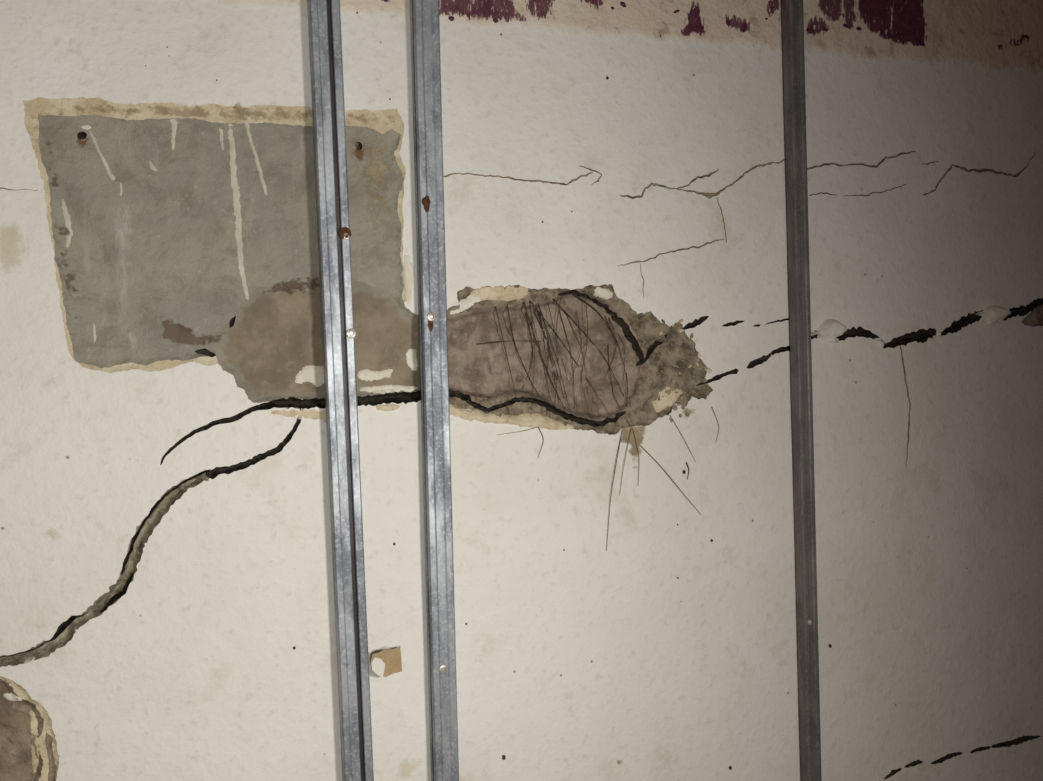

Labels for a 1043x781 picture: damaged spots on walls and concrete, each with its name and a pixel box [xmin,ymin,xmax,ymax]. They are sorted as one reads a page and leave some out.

spalling [23,97,326,423]
spalling [345,109,421,411]
crack [357,390,421,406]
crack [449,389,626,427]
spalling [447,284,719,551]
crack [557,289,790,366]
crack [443,151,1036,297]
crack [696,298,1043,468]
spalling [0,676,60,781]
crack [884,735,1041,780]